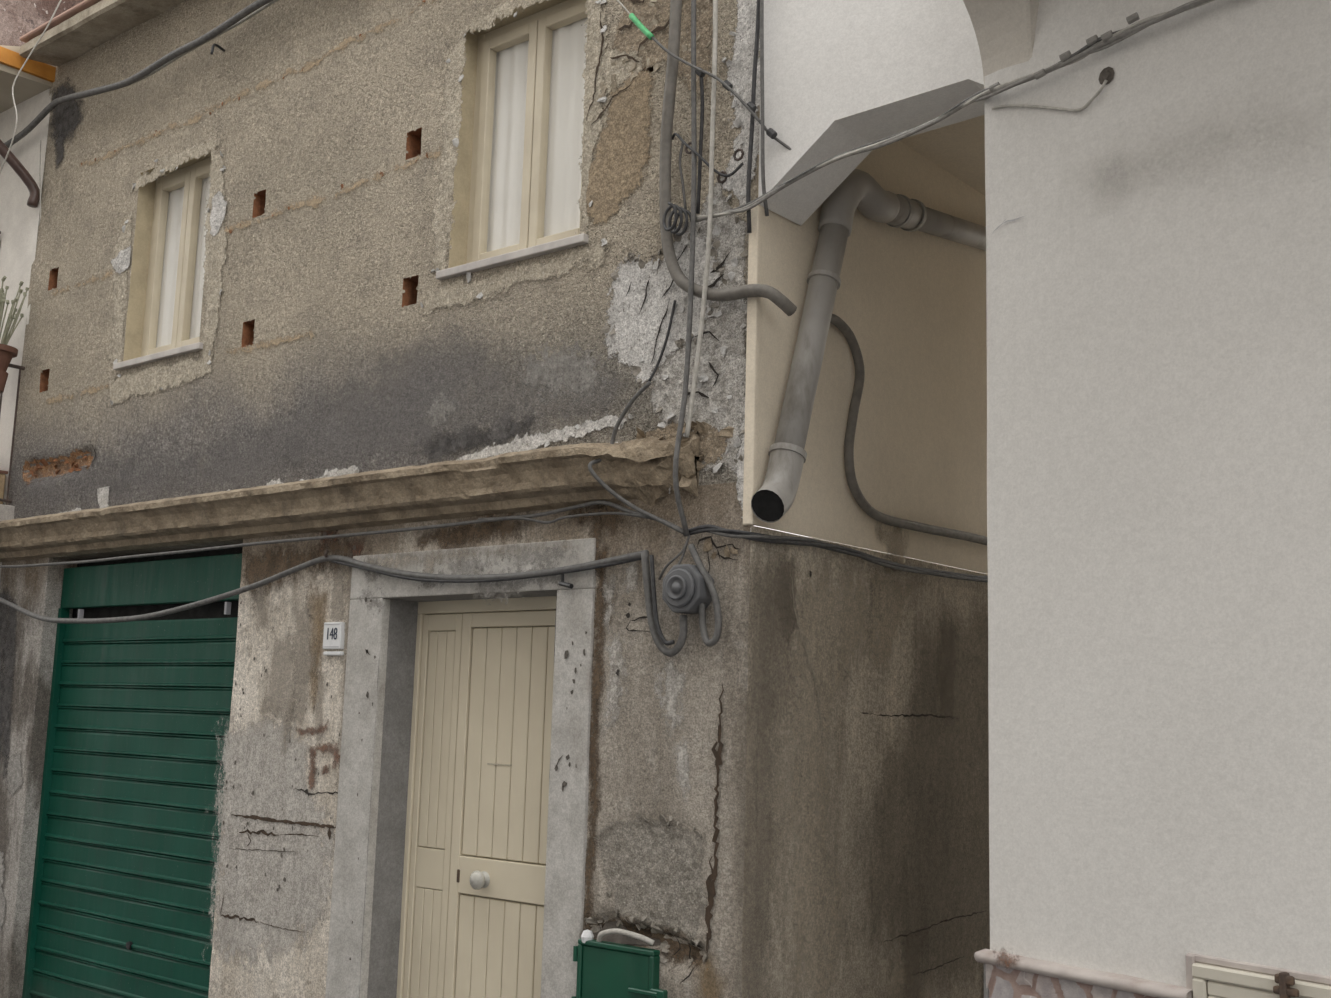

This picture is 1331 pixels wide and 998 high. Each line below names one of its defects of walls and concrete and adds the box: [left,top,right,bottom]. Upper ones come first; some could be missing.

flaking render [450,0,760,519]
flaking render [22,445,96,484]
flaking render [299,465,359,481]
crack [664,684,724,984]
leakage [778,572,912,998]